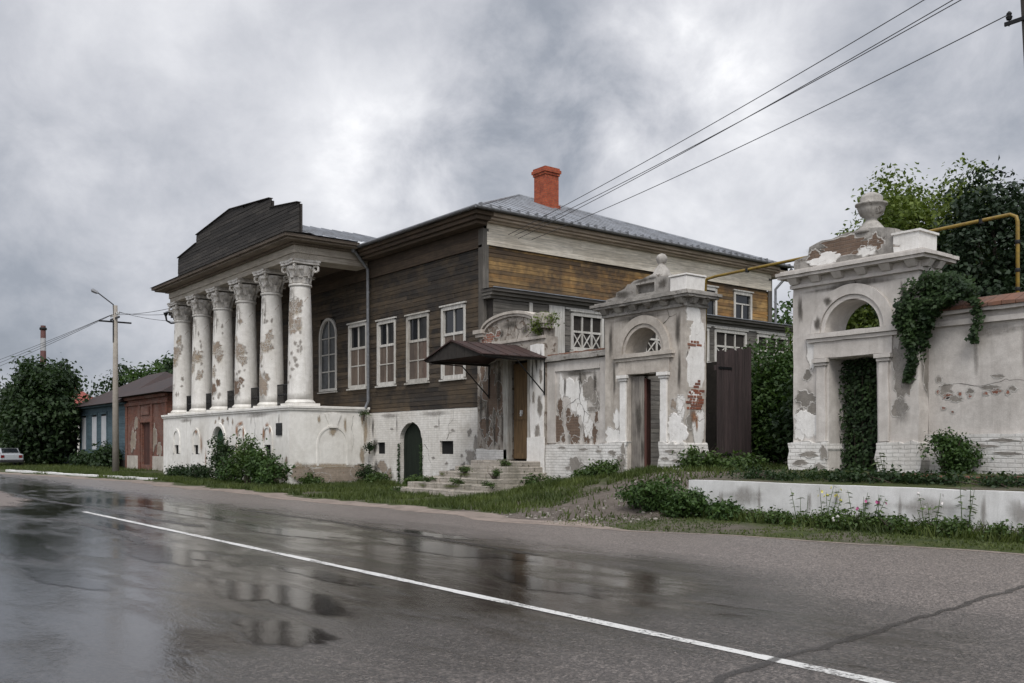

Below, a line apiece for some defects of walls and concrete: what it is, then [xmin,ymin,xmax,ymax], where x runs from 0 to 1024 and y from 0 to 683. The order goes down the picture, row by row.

spalling [806,231,886,266]
peeling [172,299,275,405]
peeling [288,297,303,384]
peeling [556,371,626,472]
peeling [660,306,705,463]
peeling [792,340,828,470]
peeling [890,322,1018,418]